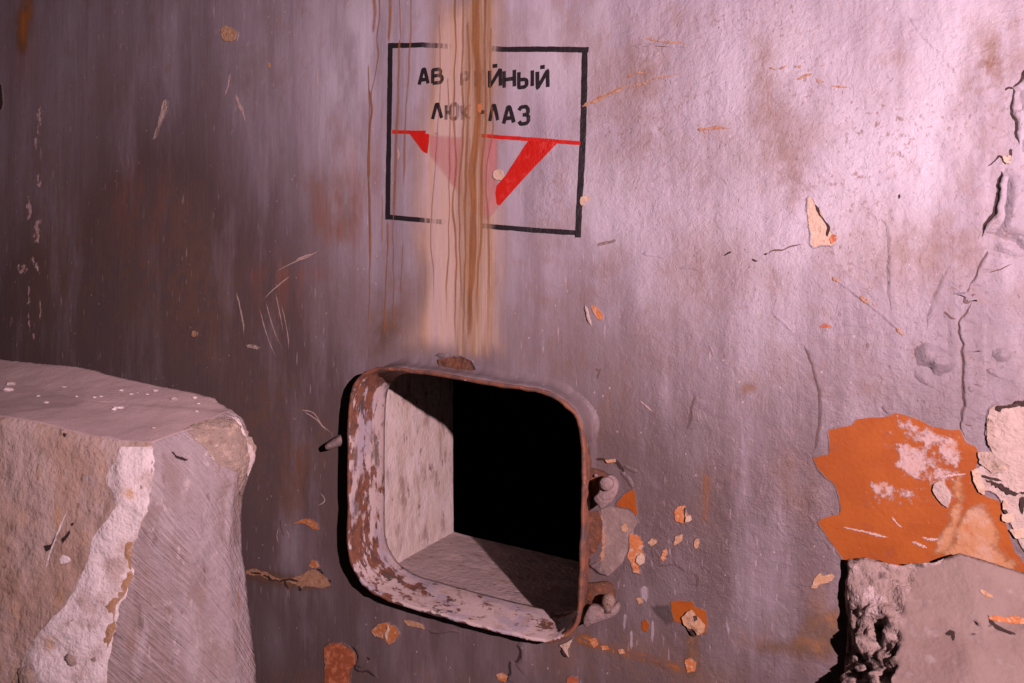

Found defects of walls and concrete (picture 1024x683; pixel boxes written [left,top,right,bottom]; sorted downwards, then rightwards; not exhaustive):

rust [367,0,411,329]
rust [435,0,492,371]
spalling [805,196,839,249]
crack [945,70,1024,439]
spalling [184,417,257,496]
peeling [812,400,1024,573]
rust [589,510,603,556]
flaking render [599,488,701,577]
peeling [323,641,357,683]
peeling [670,600,708,637]